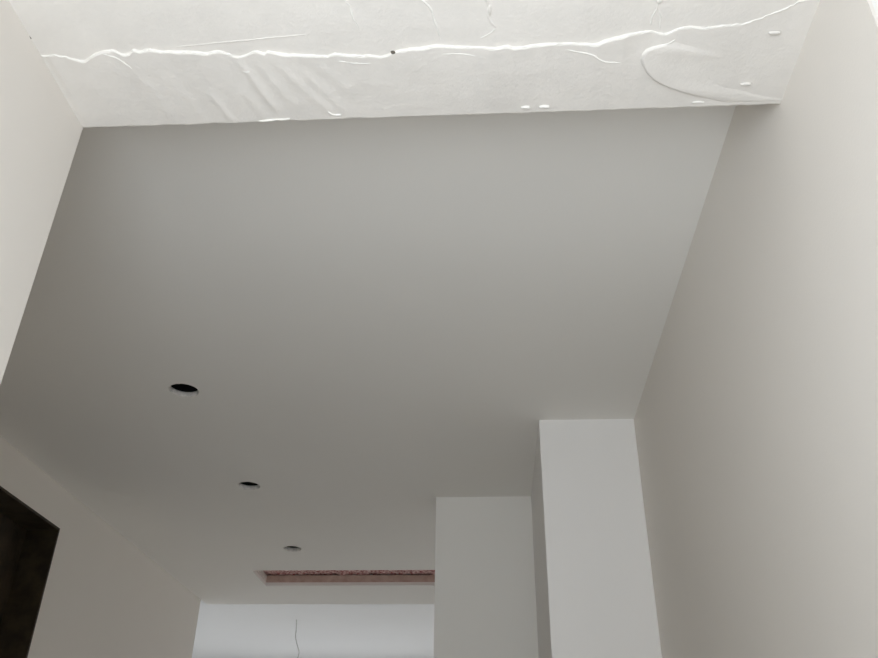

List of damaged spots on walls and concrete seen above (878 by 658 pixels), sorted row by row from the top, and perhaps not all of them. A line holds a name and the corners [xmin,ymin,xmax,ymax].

crack [41,0,810,73]